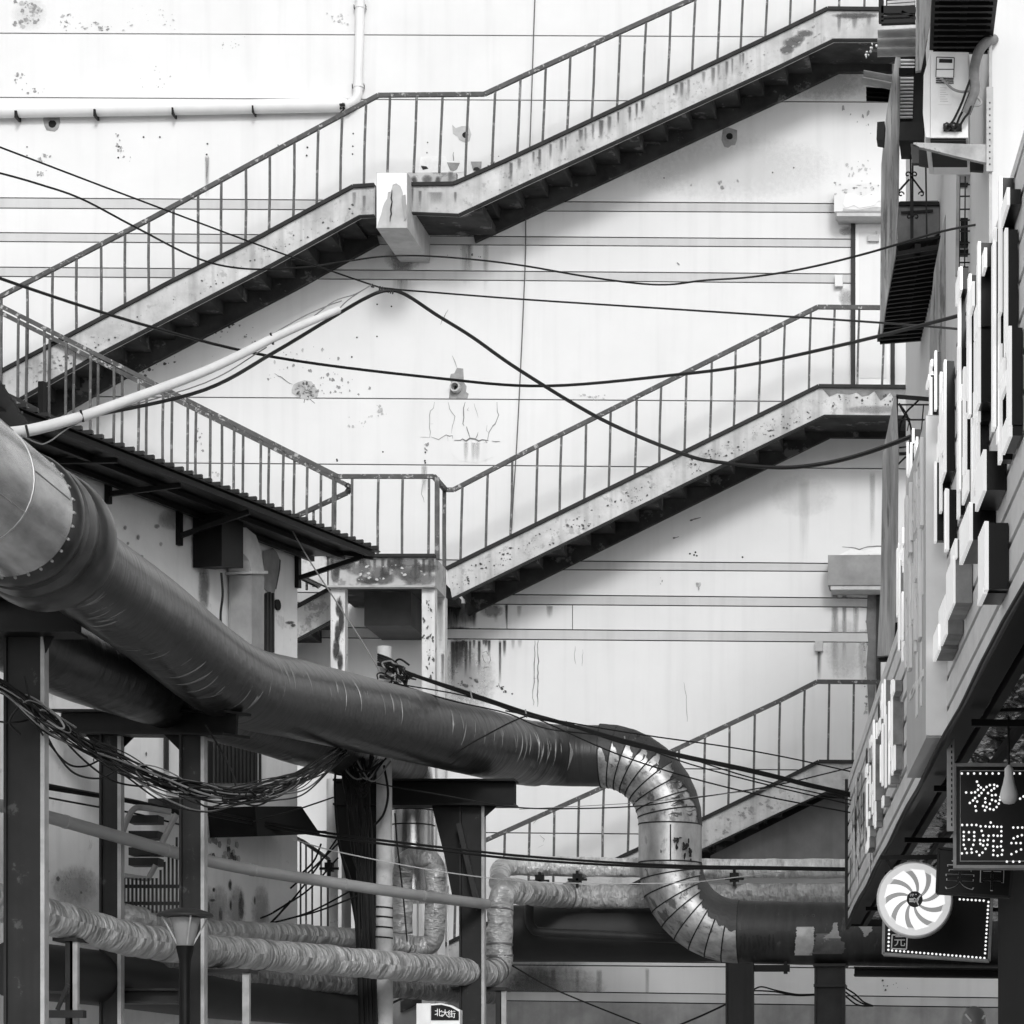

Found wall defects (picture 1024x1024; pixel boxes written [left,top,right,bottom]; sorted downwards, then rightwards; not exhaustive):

rust [780,25,821,54]
rust [594,100,644,139]
crack [428,402,500,463]
damp [831,586,881,633]
damp [447,604,508,689]